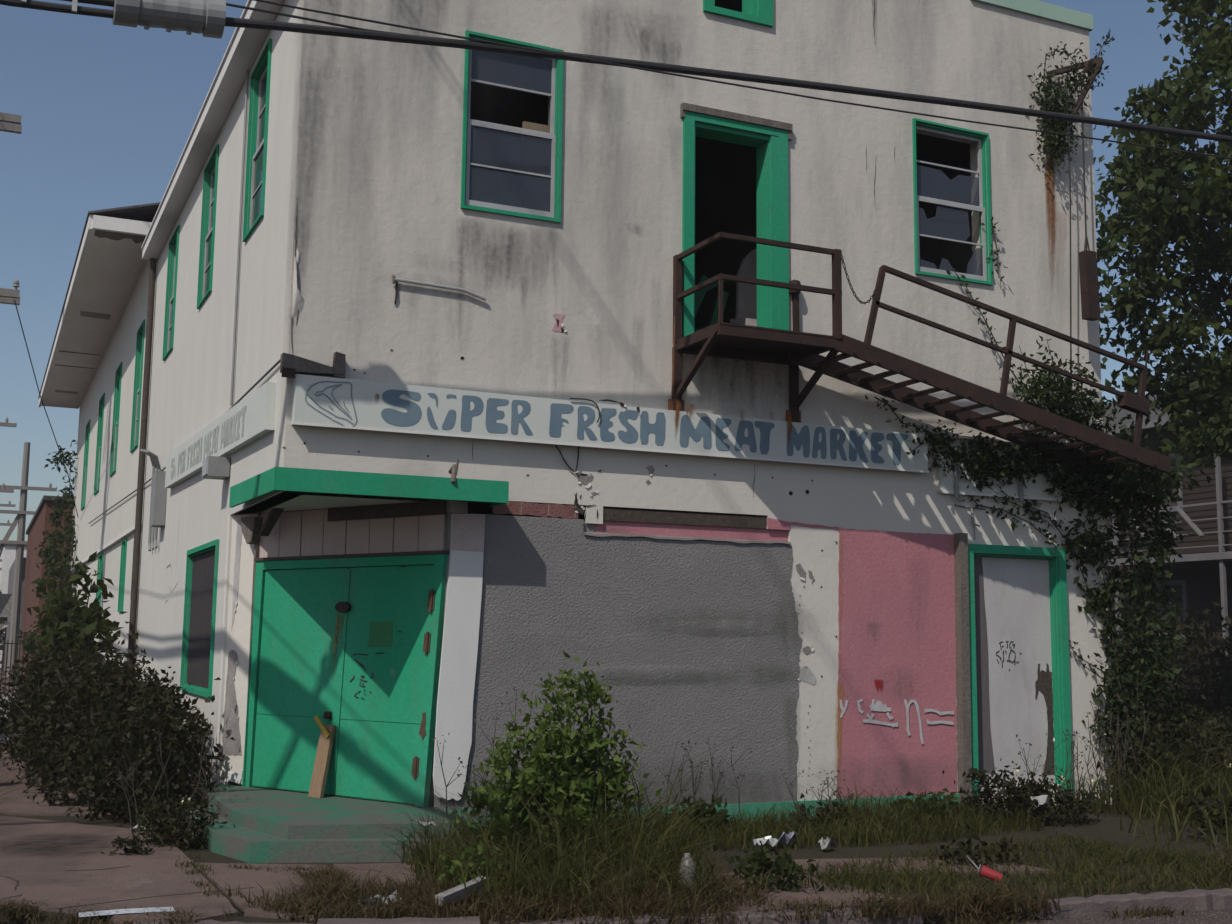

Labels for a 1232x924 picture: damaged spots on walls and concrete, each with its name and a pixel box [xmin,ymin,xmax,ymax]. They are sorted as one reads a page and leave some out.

rust [1046,160,1054,228]